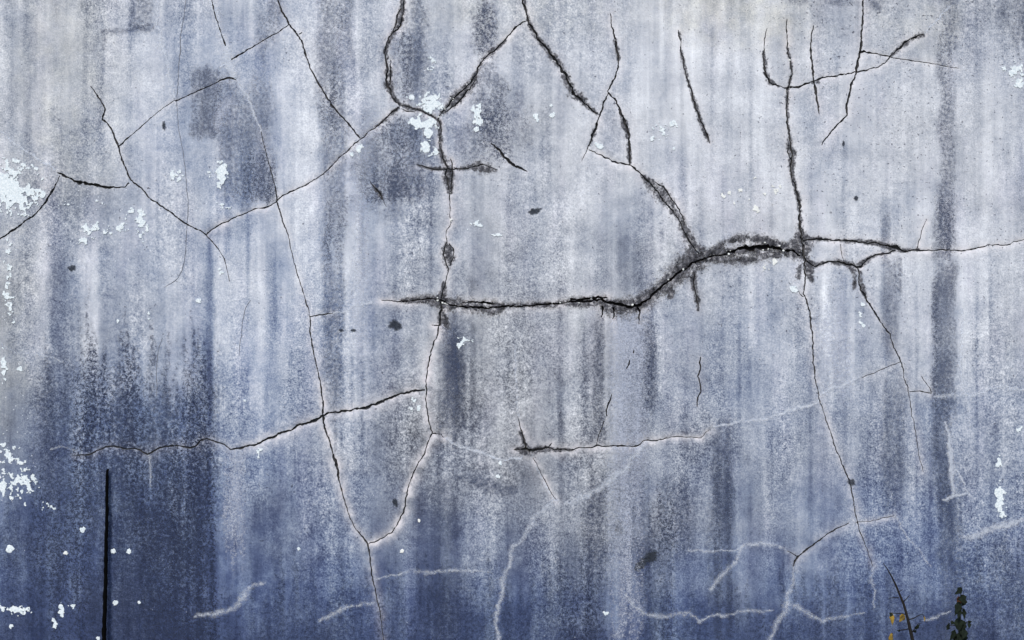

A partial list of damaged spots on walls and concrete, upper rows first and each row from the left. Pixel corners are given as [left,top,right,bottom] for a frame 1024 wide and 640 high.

peeling [0,433,40,506]
peeling [0,158,47,218]
crack [0,172,130,239]
leakage [3,316,362,640]
crack [73,301,450,640]
crack [90,0,526,310]
peeling [406,91,445,157]
peeling [471,103,483,132]
leakage [460,3,526,161]
leakage [378,310,766,640]
crack [382,0,1024,480]
leakage [776,1,1024,640]